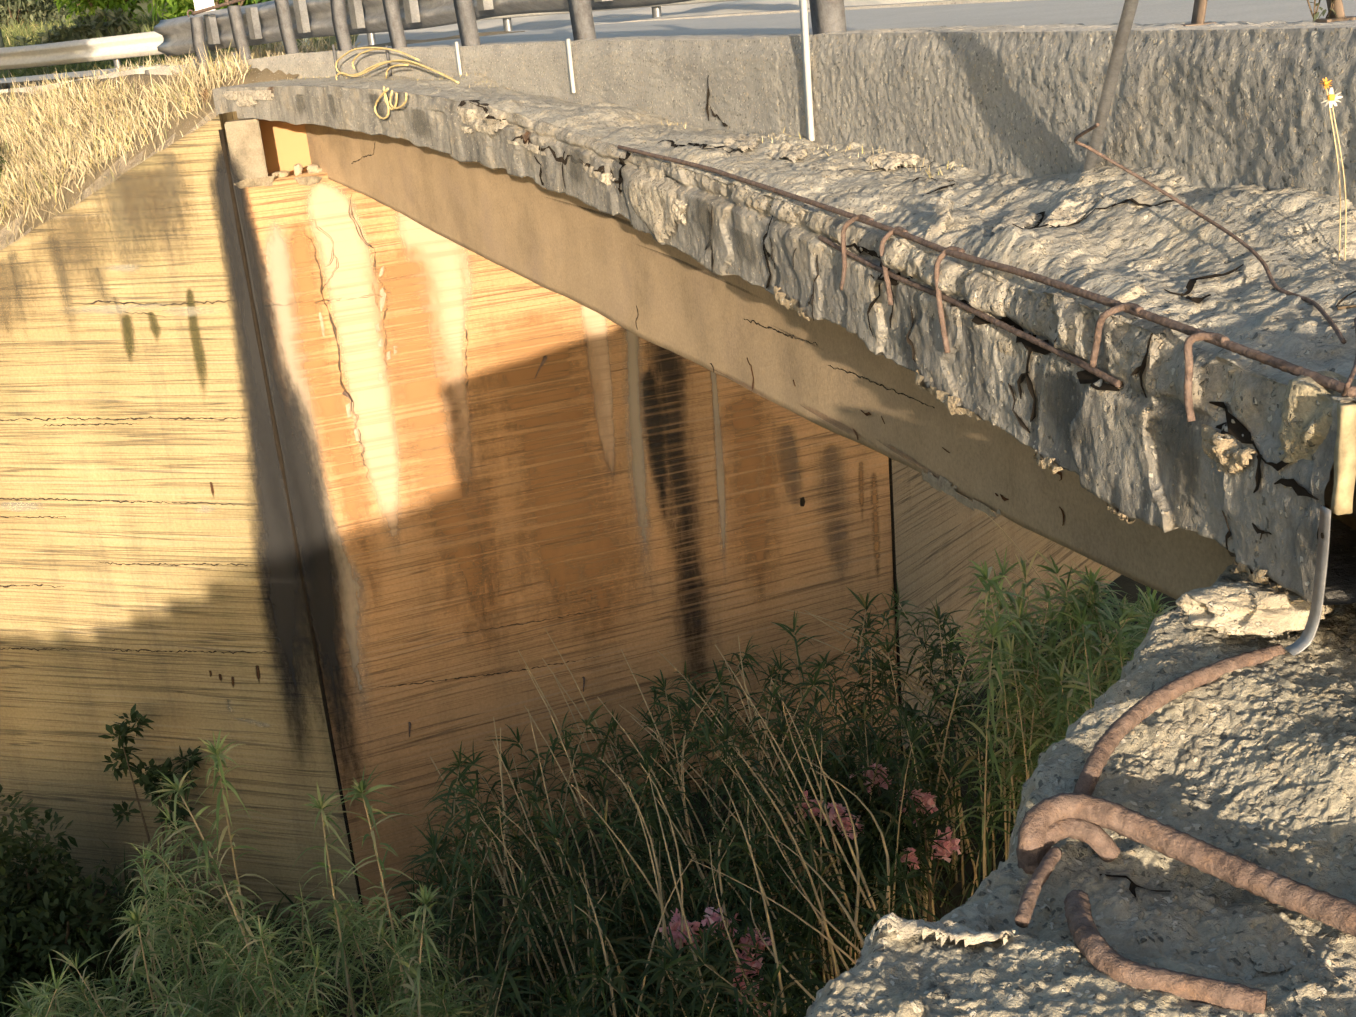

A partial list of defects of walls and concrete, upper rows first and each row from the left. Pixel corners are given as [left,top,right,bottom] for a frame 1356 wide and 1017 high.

crack [70,300,237,317]
leakage [211,151,362,769]
crack [270,143,388,479]
leakage [308,184,399,536]
leakage [582,305,706,677]
leakage [711,371,725,548]
spalling [583,145,1356,474]
crack [1012,198,1174,229]
crack [1164,264,1244,304]
spalling [865,643,1356,947]
spalling [1064,890,1267,1014]
spalling [1247,944,1356,1017]